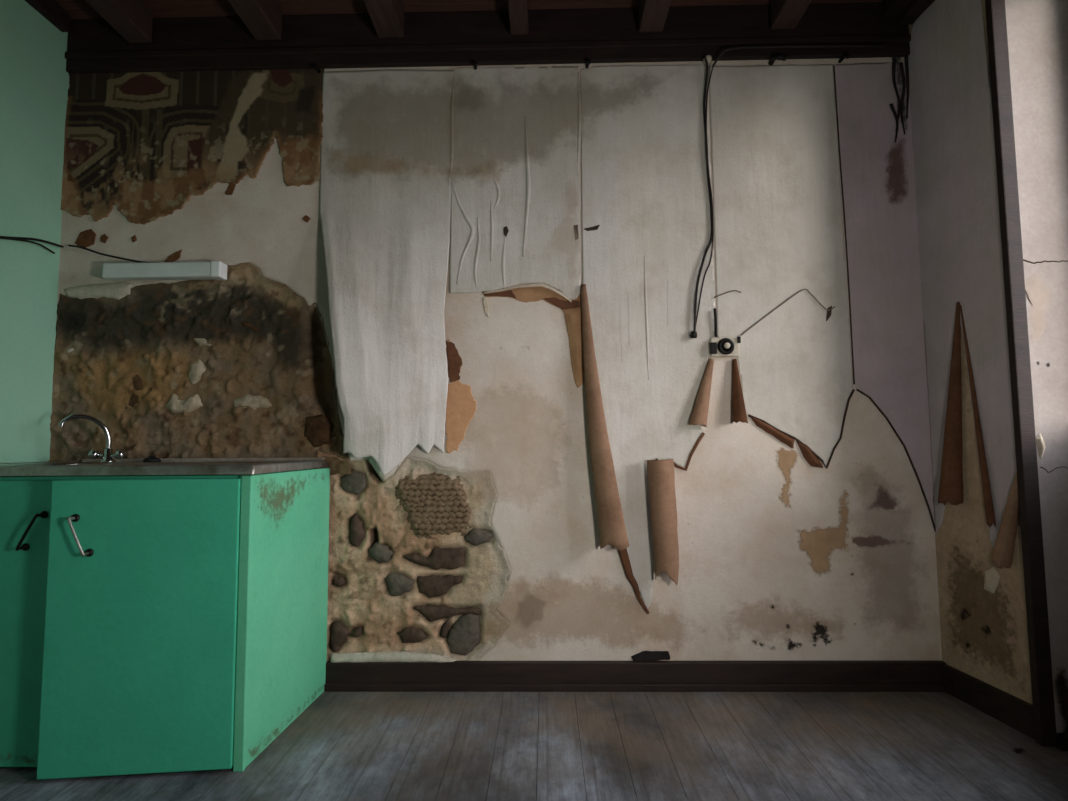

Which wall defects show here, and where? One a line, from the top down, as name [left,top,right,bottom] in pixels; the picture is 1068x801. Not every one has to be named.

flaking render [48,262,511,663]
damp [786,622,832,650]
damp [1054,670,1068,733]